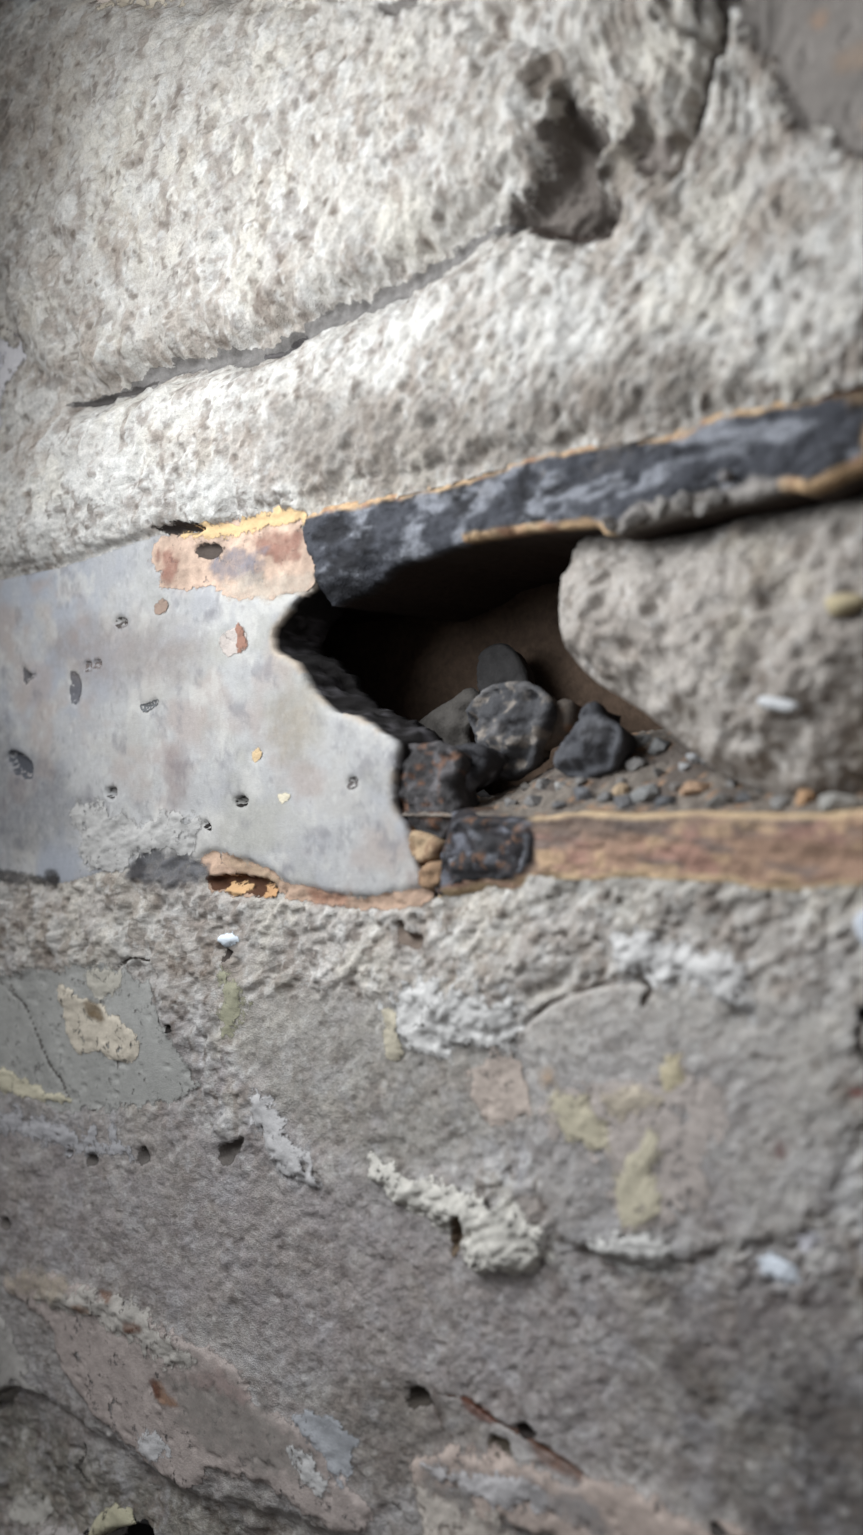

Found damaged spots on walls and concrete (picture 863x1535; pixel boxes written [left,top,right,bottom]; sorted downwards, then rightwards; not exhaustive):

crack [677,0,731,177]
flaking render [0,338,26,428]
spalling [148,505,315,615]
spalling [70,659,102,705]
spalling [140,699,159,712]
spalling [219,622,248,657]
spalling [8,750,34,779]
flaking render [407,1434,752,1535]